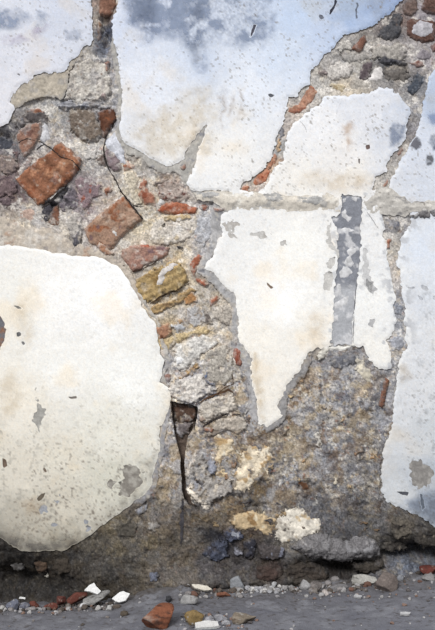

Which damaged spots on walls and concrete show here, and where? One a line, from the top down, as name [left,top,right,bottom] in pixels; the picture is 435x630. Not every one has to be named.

crack [18,138,81,170]
crack [42,185,67,208]
crack [103,120,143,219]
spalling [0,0,266,449]
damp [129,0,224,44]
spalling [240,0,435,192]
crack [171,375,239,544]
spalling [0,213,435,604]